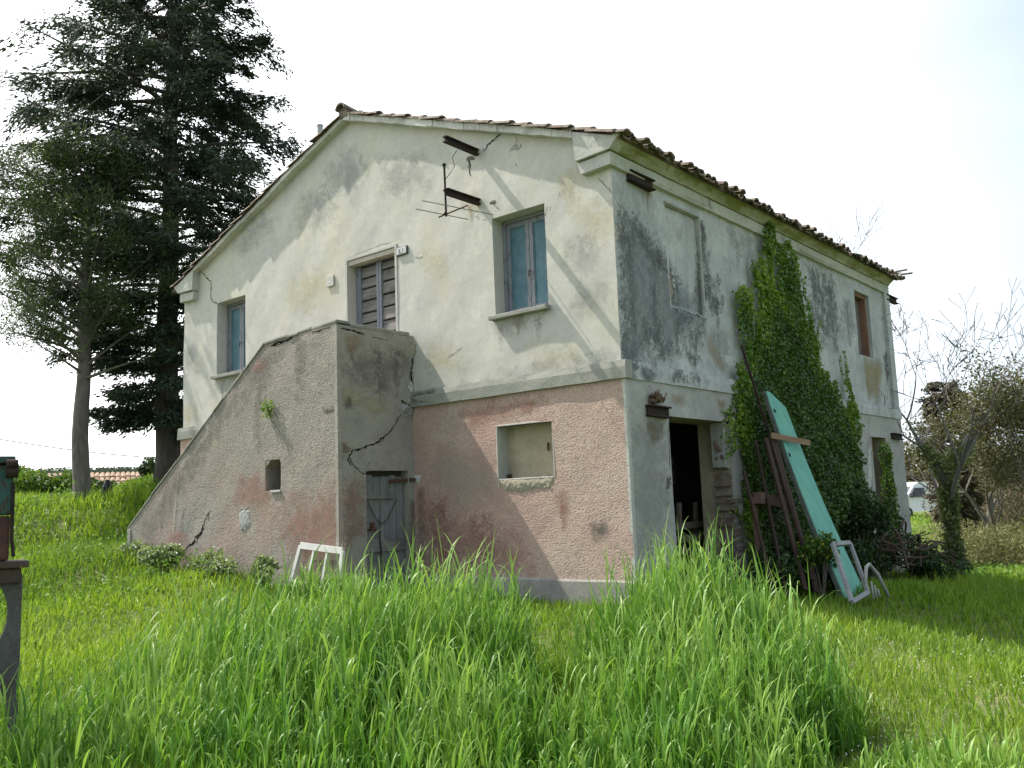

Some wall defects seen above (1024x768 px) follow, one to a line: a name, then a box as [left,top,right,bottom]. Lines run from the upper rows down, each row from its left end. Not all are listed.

damp [614,205,724,385]
damp [804,263,849,348]
crack [347,358,414,474]
crack [181,511,209,551]